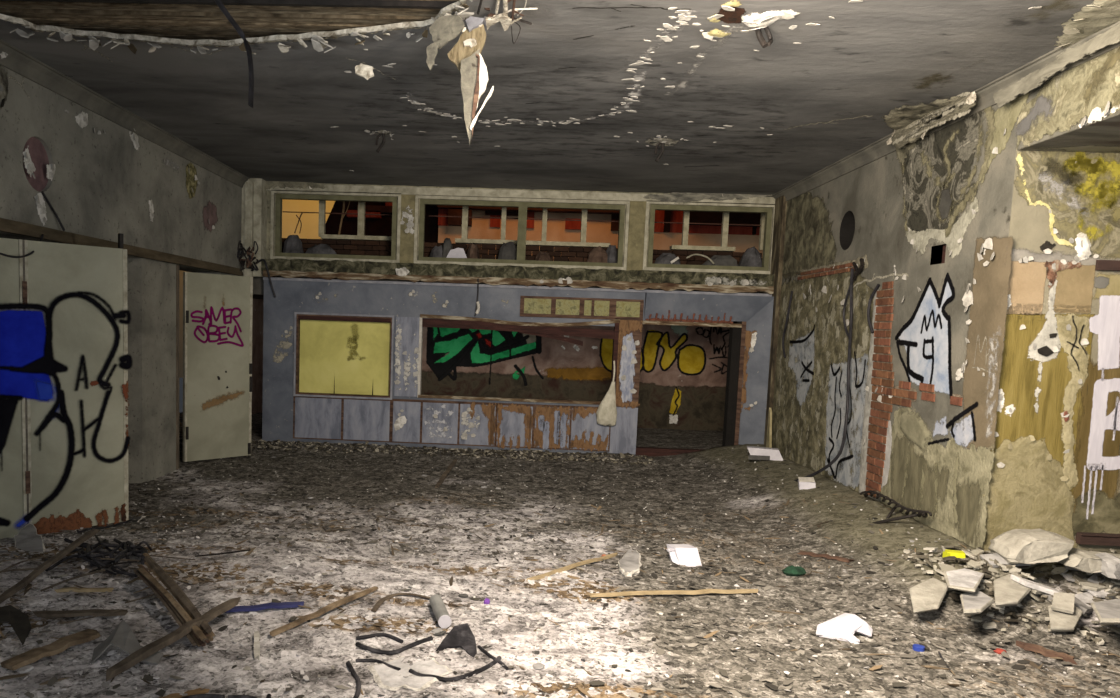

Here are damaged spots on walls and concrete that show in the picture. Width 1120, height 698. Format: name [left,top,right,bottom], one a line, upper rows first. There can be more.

flaking render [6,0,473,54]
flaking render [476,0,835,127]
peeling [401,95,460,119]
damp [1014,46,1120,258]
peeling [705,276,767,286]
flaking render [772,0,1120,551]
damp [1093,273,1120,299]
rust [34,503,126,535]